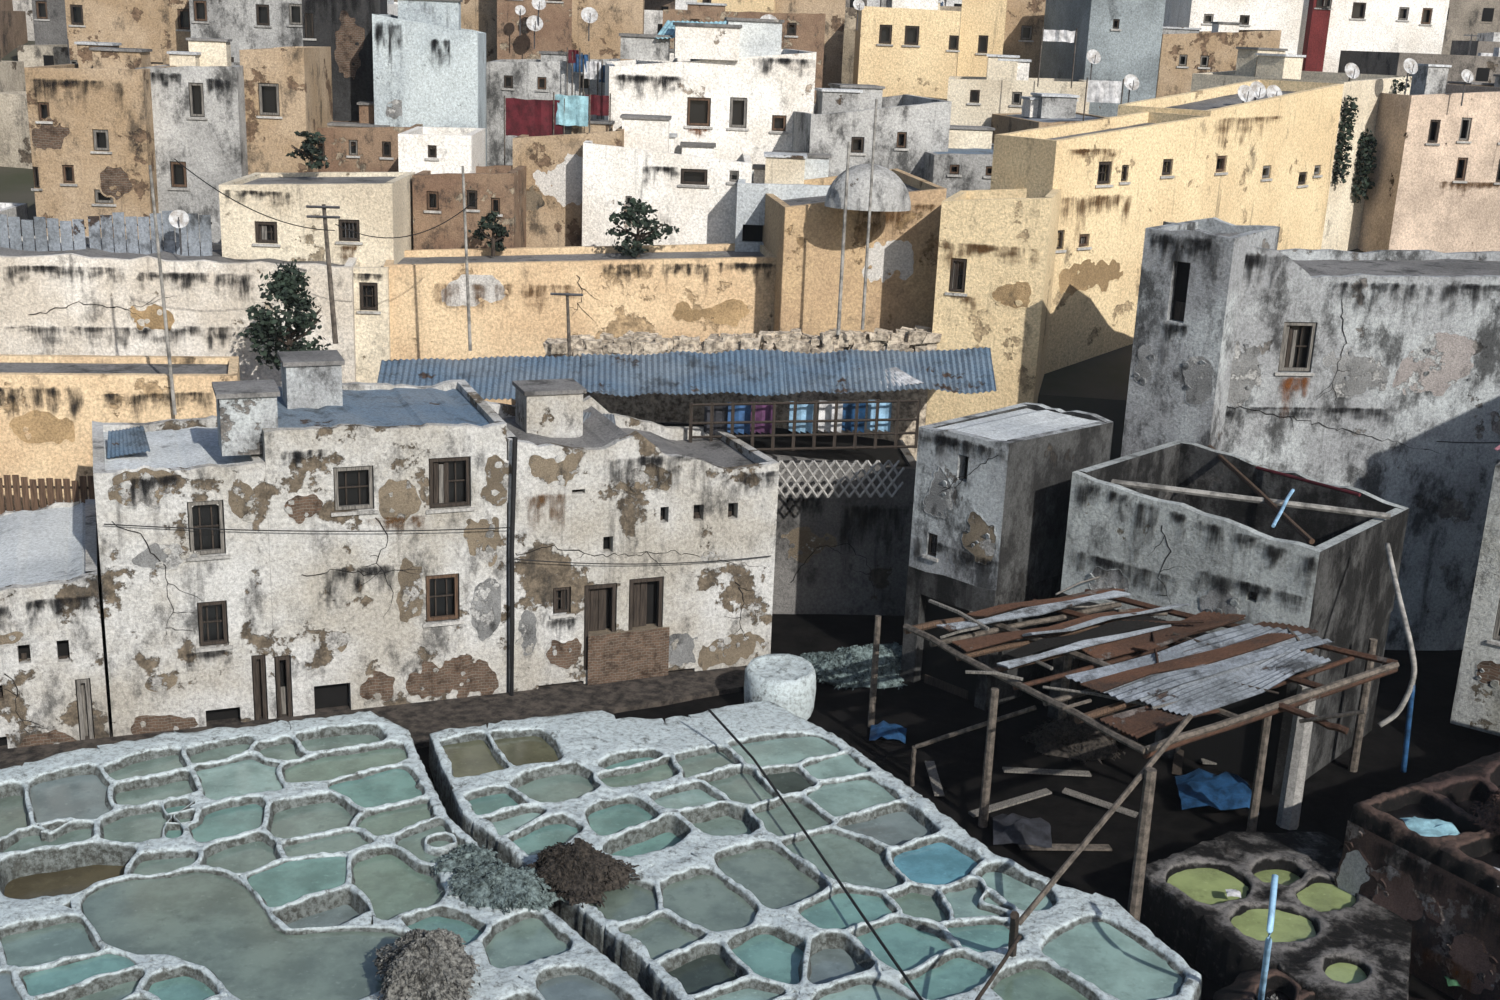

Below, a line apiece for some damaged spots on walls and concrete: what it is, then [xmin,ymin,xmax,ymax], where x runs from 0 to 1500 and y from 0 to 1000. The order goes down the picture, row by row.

peeling [1057,257,1124,298]
leakage [1244,255,1278,282]
peeling [990,279,1033,311]
leakage [1342,283,1500,306]
leakage [1333,408,1387,421]
leakage [920,435,1003,458]
peeling [613,463,674,496]
peeling [225,476,258,522]
spalling [282,491,326,526]
leakage [913,540,997,571]
spalling [357,450,584,707]
peeling [1334,831,1499,998]